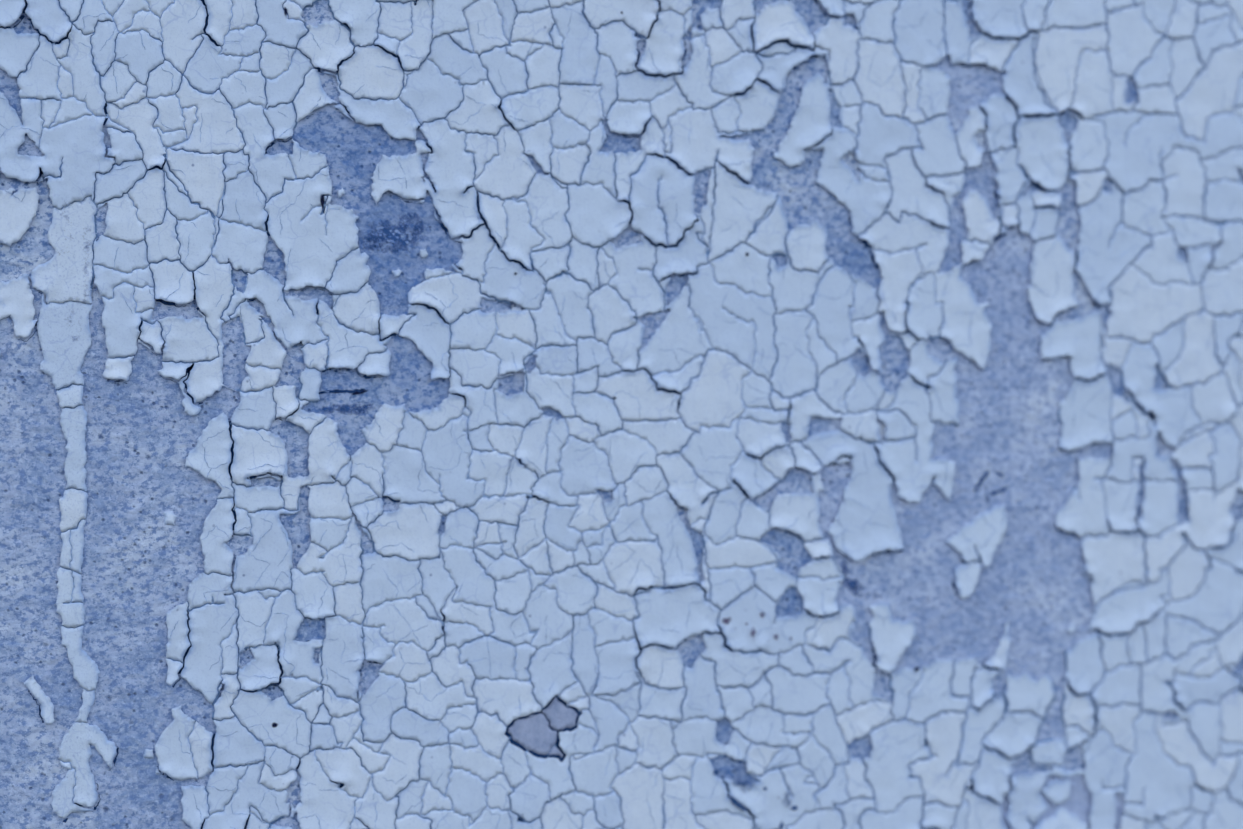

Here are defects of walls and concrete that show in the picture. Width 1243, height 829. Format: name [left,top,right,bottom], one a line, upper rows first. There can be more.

crack [0,187,39,247]
crack [0,274,90,342]
crack [138,318,172,343]
crack [162,312,219,405]
crack [201,421,301,541]
peeling [0,69,537,829]
crack [237,377,364,434]
crack [298,282,417,379]
peeling [636,0,1189,829]
crack [60,488,88,628]
crack [168,591,224,688]
crack [60,748,119,823]